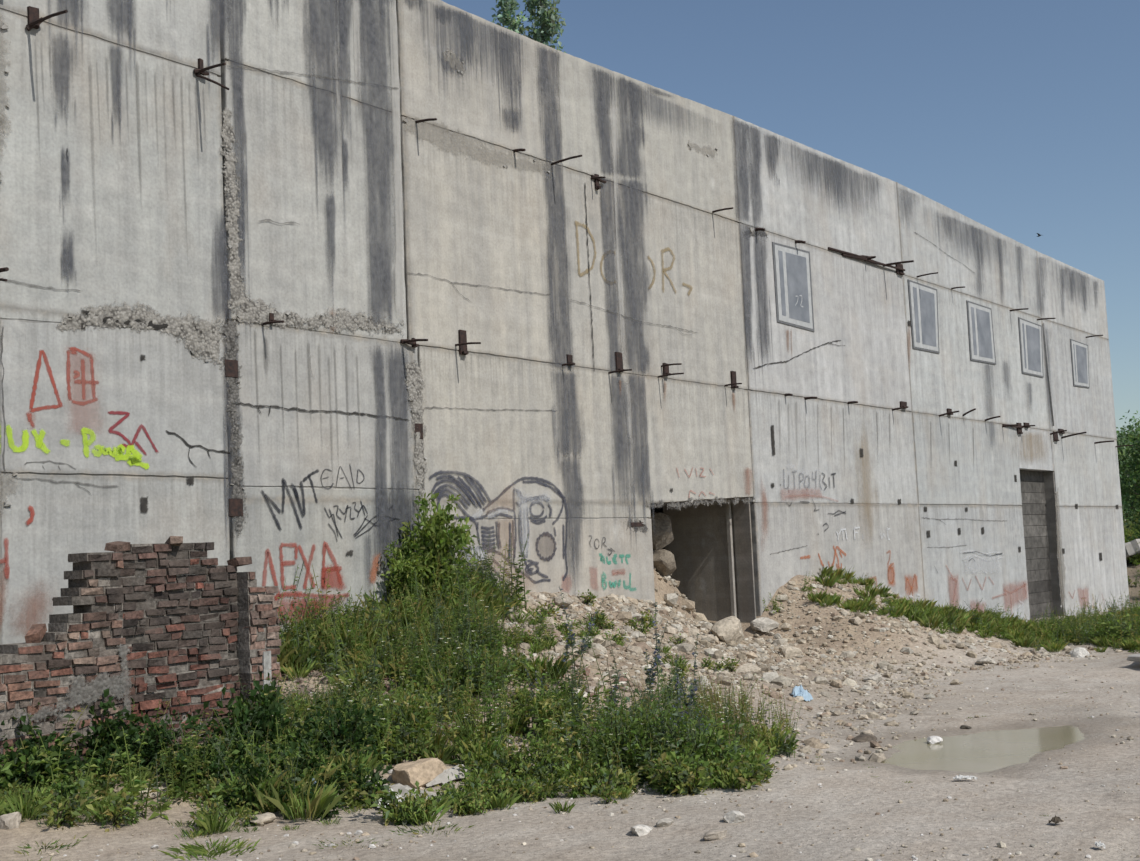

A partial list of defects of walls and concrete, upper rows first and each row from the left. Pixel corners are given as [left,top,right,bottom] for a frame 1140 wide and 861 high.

crack [166,430,231,466]
leakage [208,0,247,312]
spalling [57,109,404,536]
leakage [224,377,239,506]
leakage [308,0,403,321]
leakage [366,349,416,574]
crack [233,402,556,421]
leakage [436,8,521,129]
leakage [539,48,583,567]
leakage [595,70,682,526]
leakage [734,121,778,359]
crack [753,340,845,369]